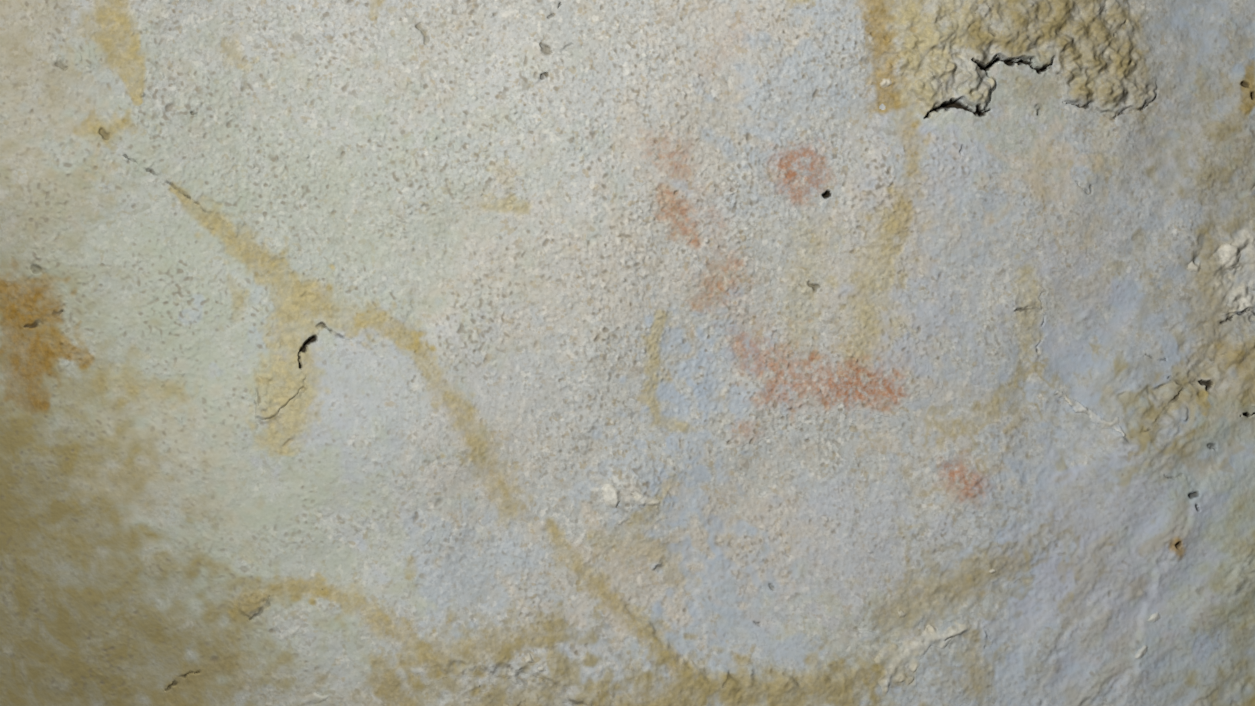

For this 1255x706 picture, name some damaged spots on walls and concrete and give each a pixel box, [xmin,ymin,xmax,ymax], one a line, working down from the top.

damp [469,142,534,224]
spalling [1219,243,1255,317]
crack [251,321,352,431]
damp [150,180,1052,706]
crack [488,666,594,706]
crack [711,668,733,706]